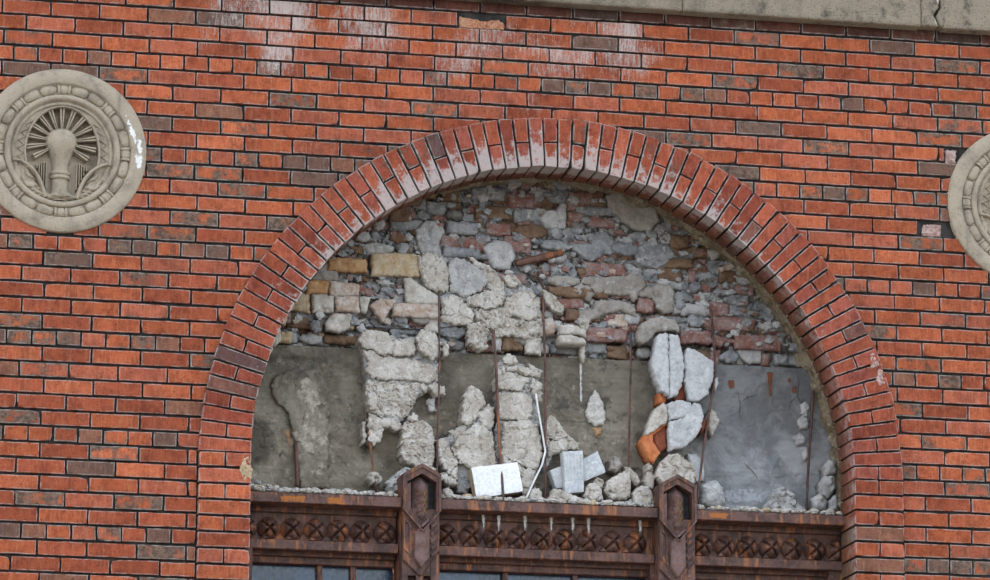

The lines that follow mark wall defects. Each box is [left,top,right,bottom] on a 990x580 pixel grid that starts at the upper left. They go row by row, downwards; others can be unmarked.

damp [254,0,310,70]
damp [344,6,392,47]
spalling [459,16,505,31]
damp [603,23,645,71]
crack [933,0,941,27]
spalling [355,251,580,497]
peeling [634,316,720,454]
spalling [870,353,885,386]
peeling [255,369,331,489]
spalling [585,390,606,437]
spalling [239,457,253,480]